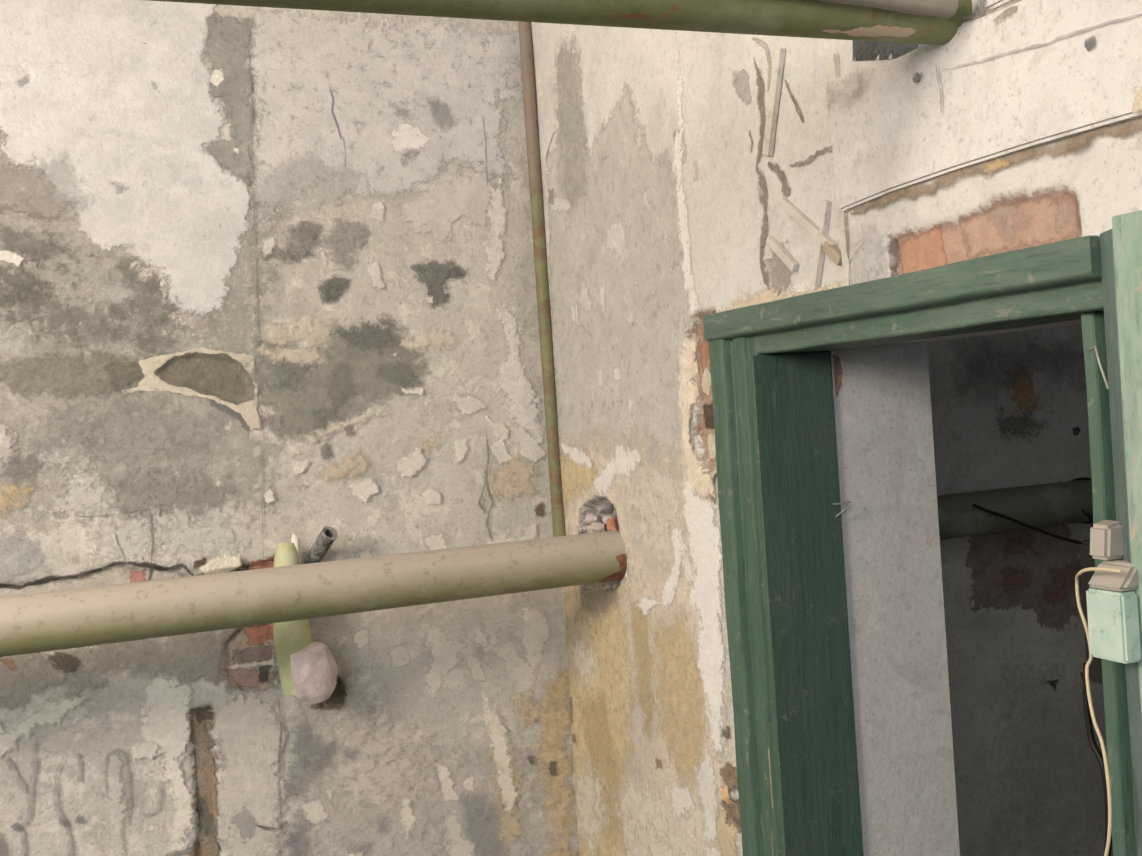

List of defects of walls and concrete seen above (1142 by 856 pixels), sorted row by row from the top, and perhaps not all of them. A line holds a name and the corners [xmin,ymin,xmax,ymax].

spalling [821,24,925,61]
spalling [887,186,1082,276]
crack [844,118,1142,285]
spalling [122,347,263,431]
damp [0,188,456,584]
peeling [264,487,276,503]
peeling [349,478,379,502]
peeling [396,447,426,478]
peeling [450,41,741,856]
crack [0,509,193,589]
damp [558,426,742,856]
peeling [213,623,288,856]